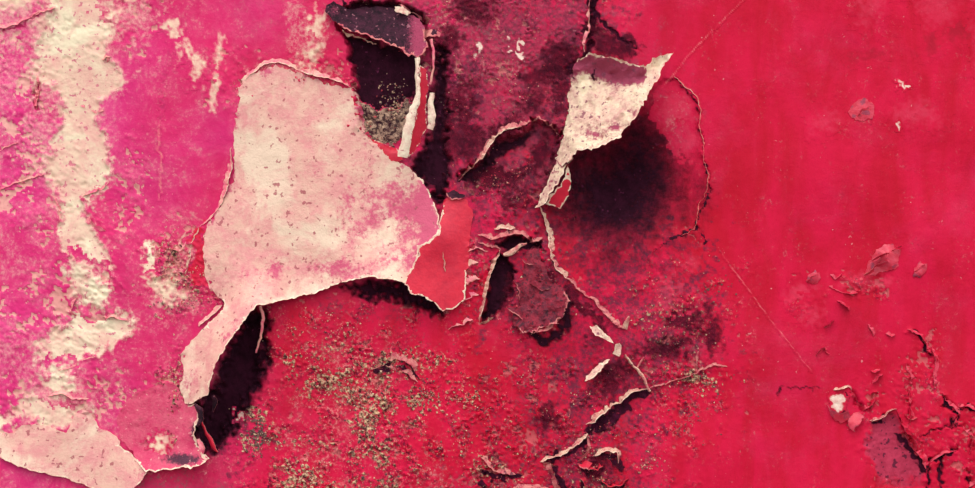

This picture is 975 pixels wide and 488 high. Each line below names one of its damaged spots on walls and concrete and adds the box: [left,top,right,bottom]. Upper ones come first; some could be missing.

peeling [0,0,687,488]
crack [660,76,711,248]
crack [540,350,727,488]
peeling [826,385,930,488]